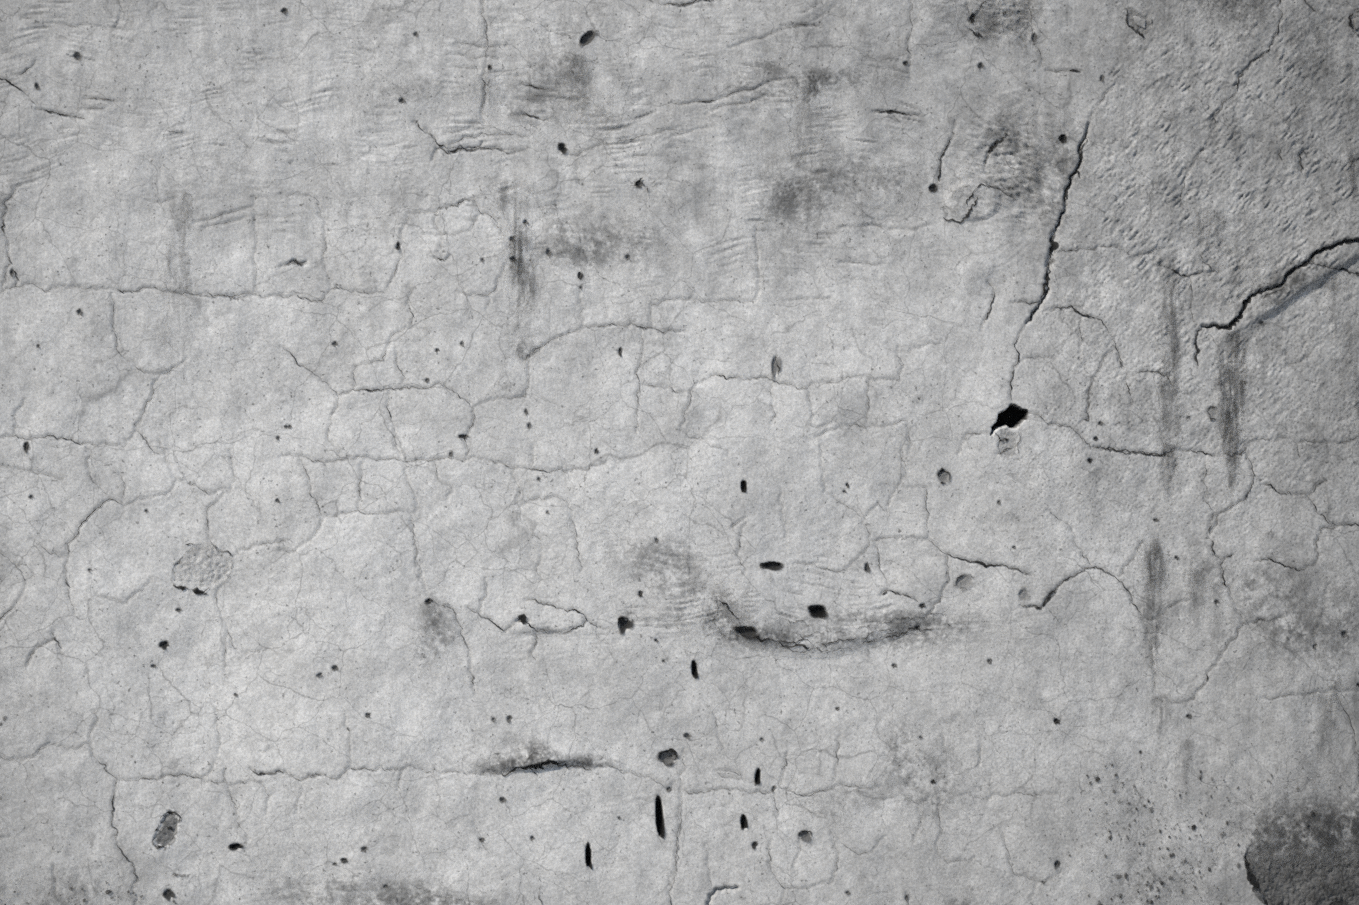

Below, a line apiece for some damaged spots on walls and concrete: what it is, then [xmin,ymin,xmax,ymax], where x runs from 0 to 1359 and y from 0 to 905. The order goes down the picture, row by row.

crack [414,12,522,154]
crack [663,0,714,8]
crack [1217,0,1315,113]
crack [938,135,954,181]
crack [1,196,48,291]
crack [111,287,256,354]
crack [984,134,1359,586]
crack [283,298,1173,620]
crack [2,435,130,609]
crack [435,584,597,659]
crack [98,761,237,878]
mould [1086,764,1215,905]